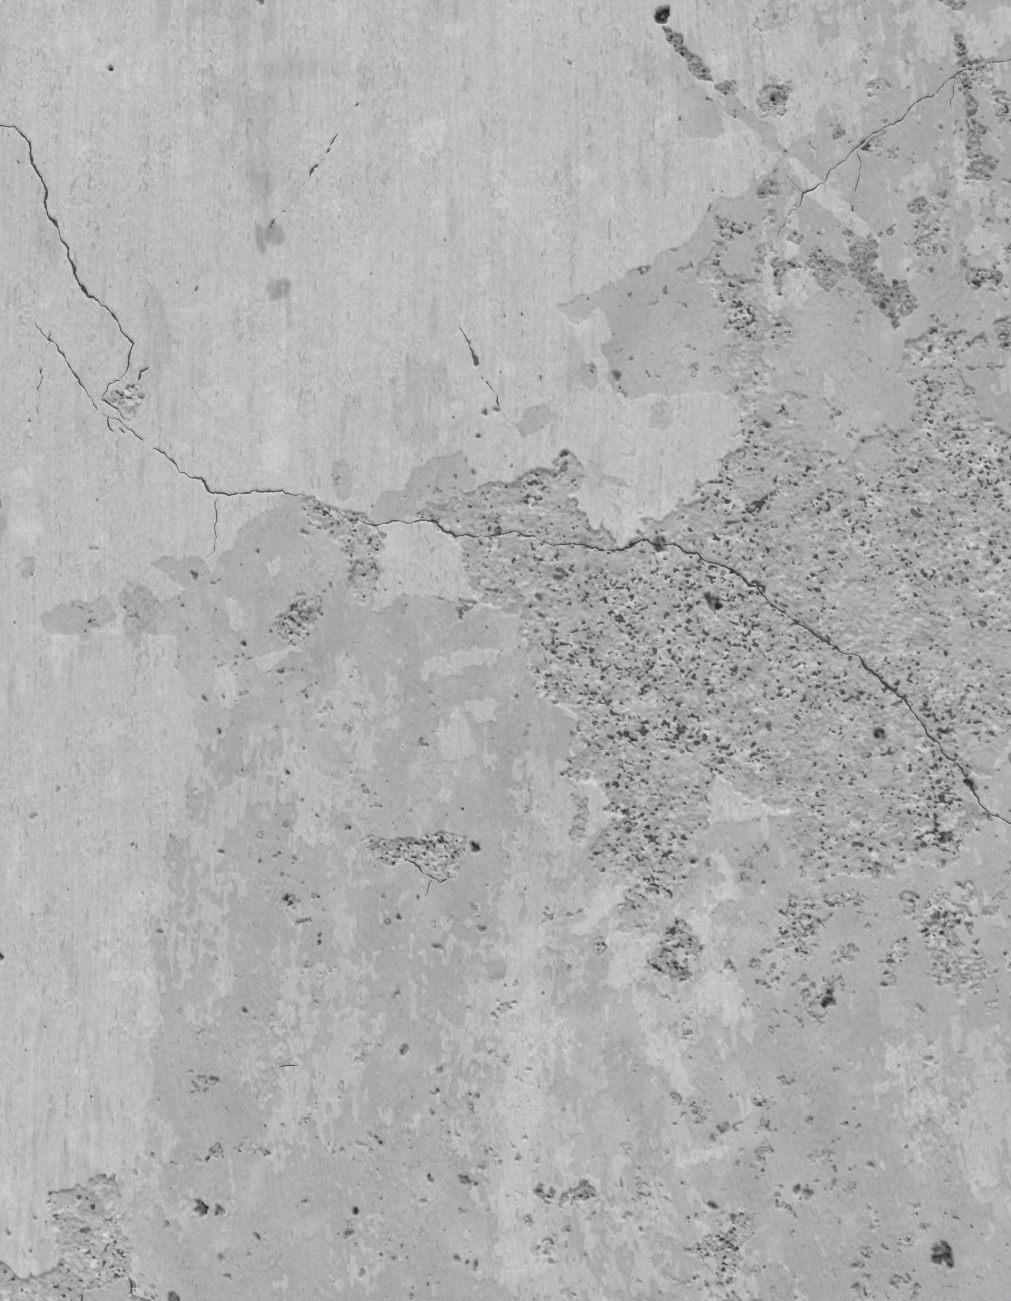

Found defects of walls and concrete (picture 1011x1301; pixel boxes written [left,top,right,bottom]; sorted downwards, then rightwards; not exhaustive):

peeling [332,461,354,504]
crack [0,125,1011,824]
spalling [373,0,1011,934]
crack [778,59,1011,234]
peeling [0,494,1011,1301]